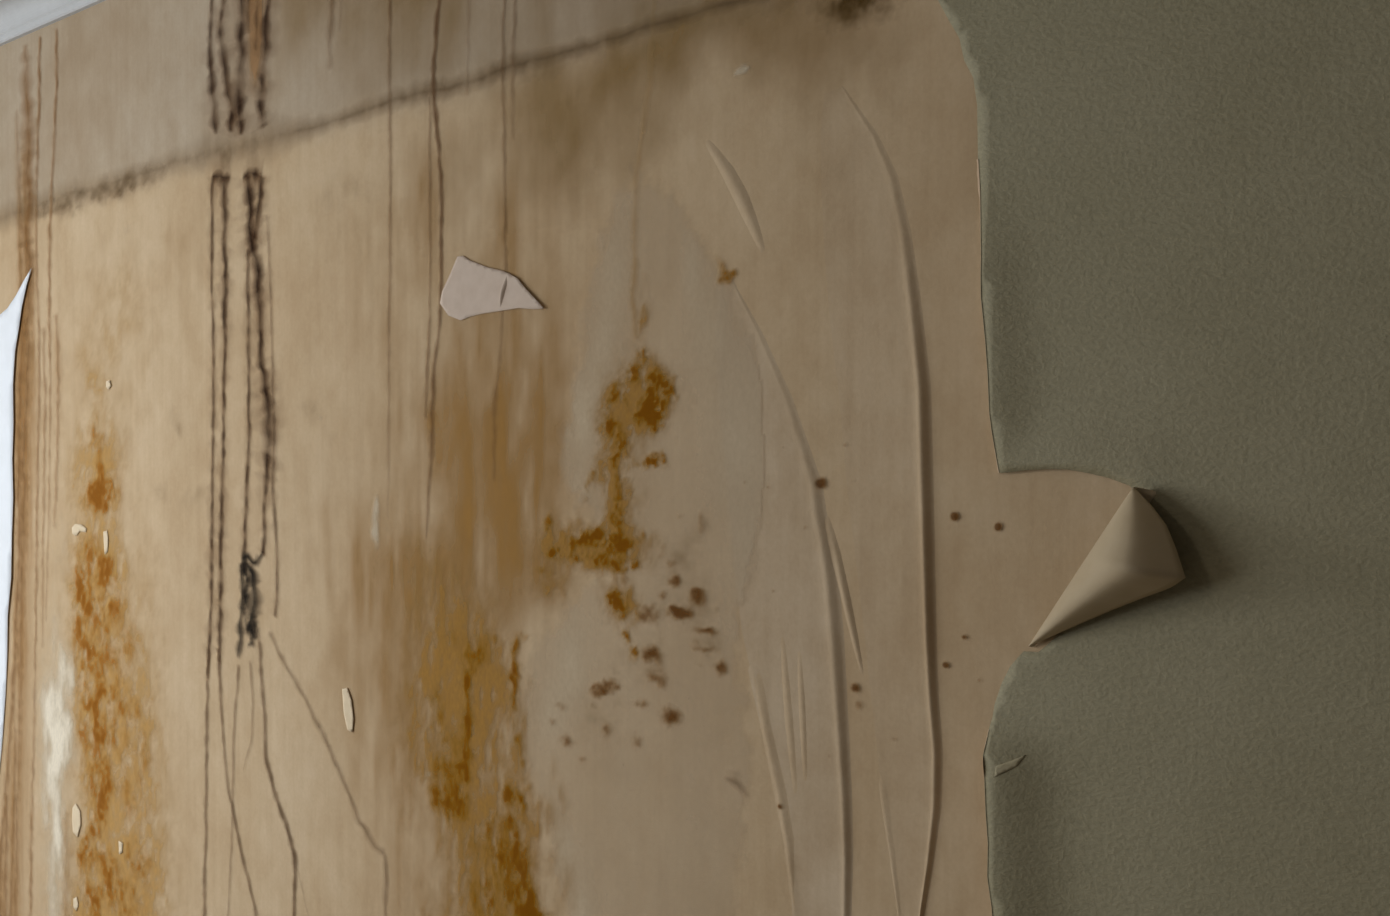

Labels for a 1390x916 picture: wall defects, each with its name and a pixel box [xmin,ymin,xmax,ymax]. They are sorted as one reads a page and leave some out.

peeling [41,649,75,916]
corrosion [69,417,165,916]
leakage [208,496,222,660]
leakage [208,0,268,133]
leakage [211,171,275,656]
peeling [342,688,354,732]
leakage [420,0,442,291]
leakage [354,309,562,668]
corrosion [407,559,543,916]
peeling [440,256,544,320]
corrosion [541,349,675,656]
leakage [831,0,874,21]